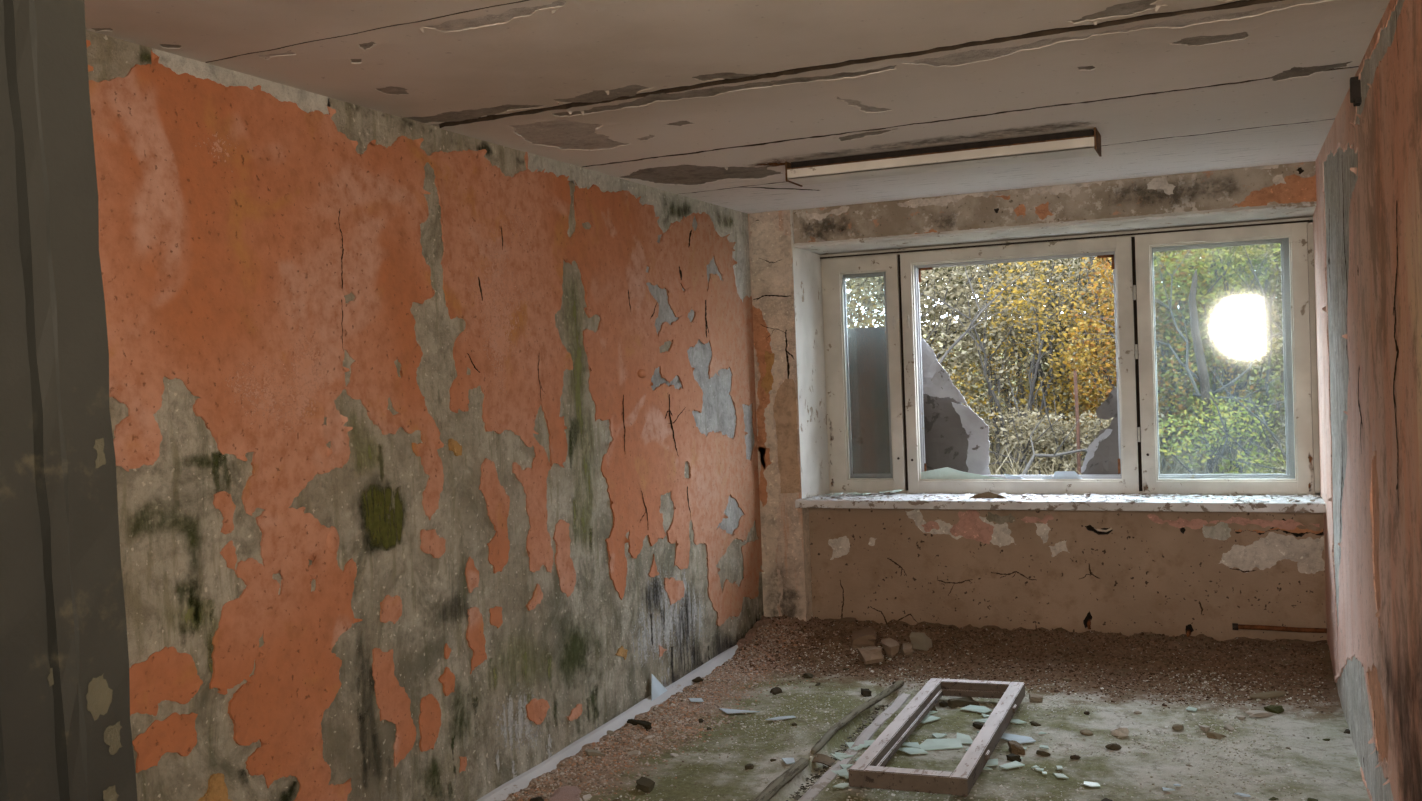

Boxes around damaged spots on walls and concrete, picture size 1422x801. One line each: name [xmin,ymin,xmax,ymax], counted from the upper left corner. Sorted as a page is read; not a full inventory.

peeling [418,0,566,32]
peeling [800,0,1405,627]
leakage [189,452,230,487]
peeling [86,28,897,801]
leakage [132,506,201,565]
leakage [176,585,216,673]
leakage [559,626,600,682]
leakage [625,564,736,687]
leakage [281,781,297,801]
leakage [425,684,557,797]
peeling [1335,652,1394,801]
leakage [1387,665,1422,801]